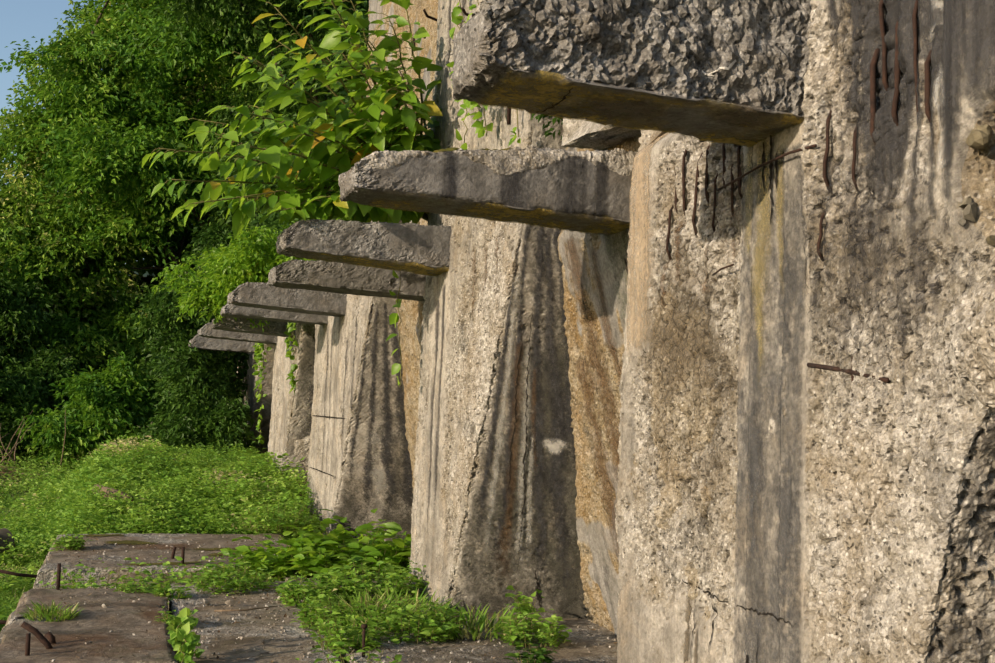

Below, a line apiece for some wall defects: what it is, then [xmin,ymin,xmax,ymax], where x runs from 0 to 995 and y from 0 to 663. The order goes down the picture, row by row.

damp [447,0,466,70]
damp [442,151,456,198]
spalling [956,100,995,246]
damp [310,253,449,276]
rust [660,225,682,305]
damp [454,0,995,663]
damp [297,324,332,469]
damp [338,287,445,551]
crack [682,580,796,655]